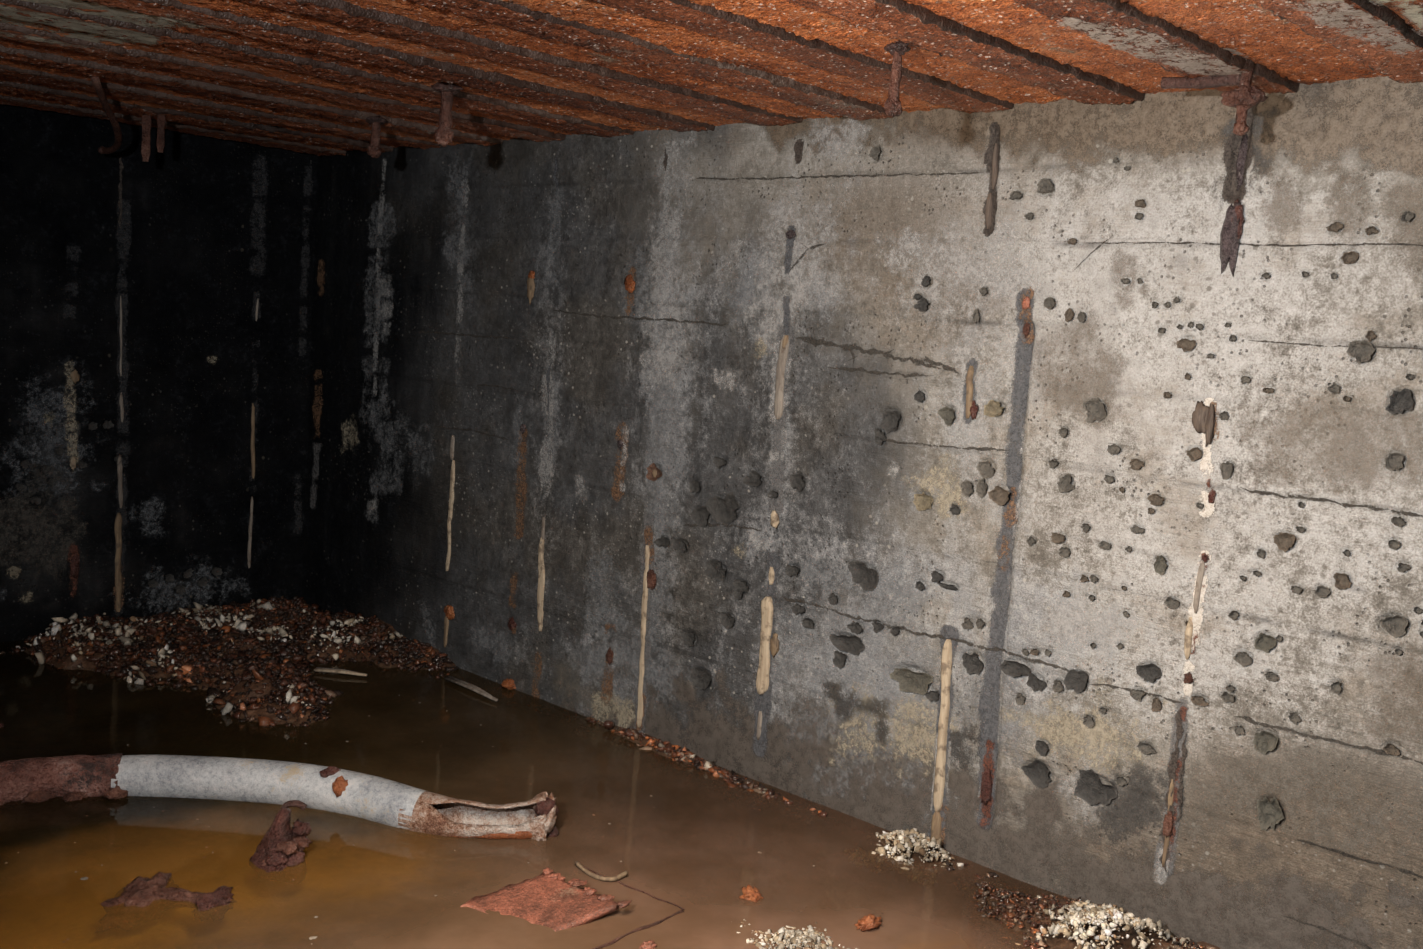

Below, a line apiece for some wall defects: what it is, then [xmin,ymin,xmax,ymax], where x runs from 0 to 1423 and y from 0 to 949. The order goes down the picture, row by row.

damp [250,156,268,275]
damp [640,210,692,385]
damp [744,174,835,419]
crack [1076,235,1423,268]
crack [797,337,959,377]
rust [970,400,978,420]
damp [0,375,106,579]
damp [129,497,165,536]
damp [126,561,249,612]
crack [782,596,1186,704]
rust [980,740,995,827]
rust [1154,699,1188,883]